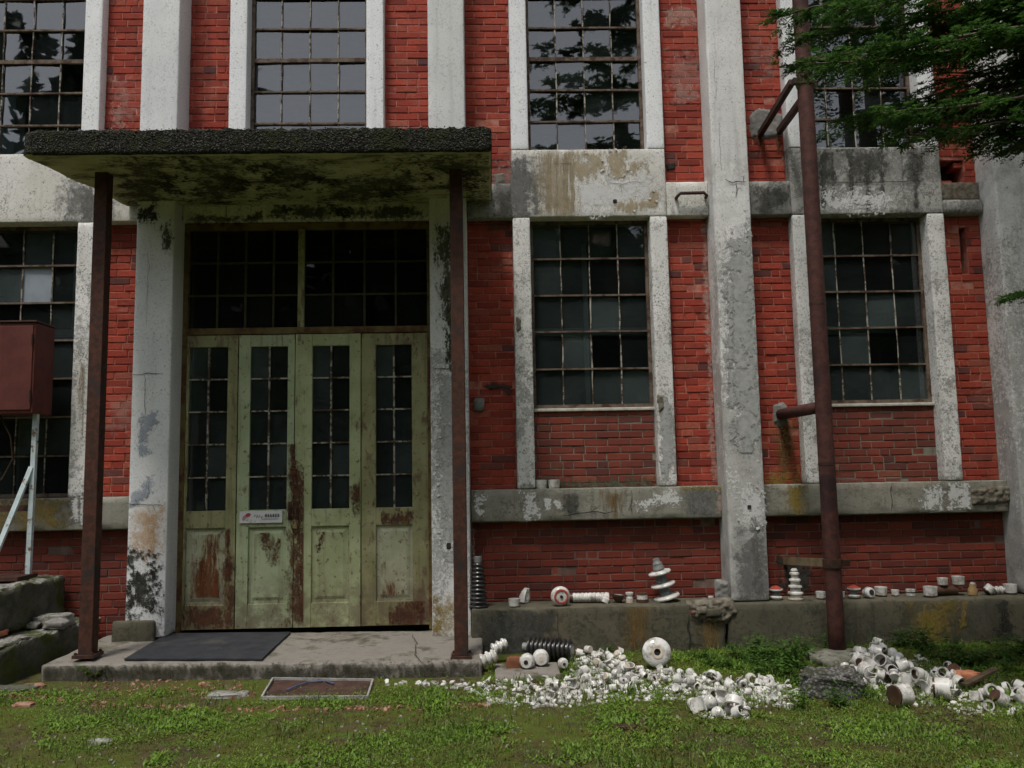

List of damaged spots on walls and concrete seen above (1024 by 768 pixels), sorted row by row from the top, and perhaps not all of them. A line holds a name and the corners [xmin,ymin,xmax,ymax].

leakage [102,153,489,207]
leakage [510,150,581,216]
leakage [817,148,889,212]
leakage [903,148,928,207]
leakage [125,508,165,625]
rust [182,529,234,630]
rust [284,444,304,627]
rust [381,508,414,524]